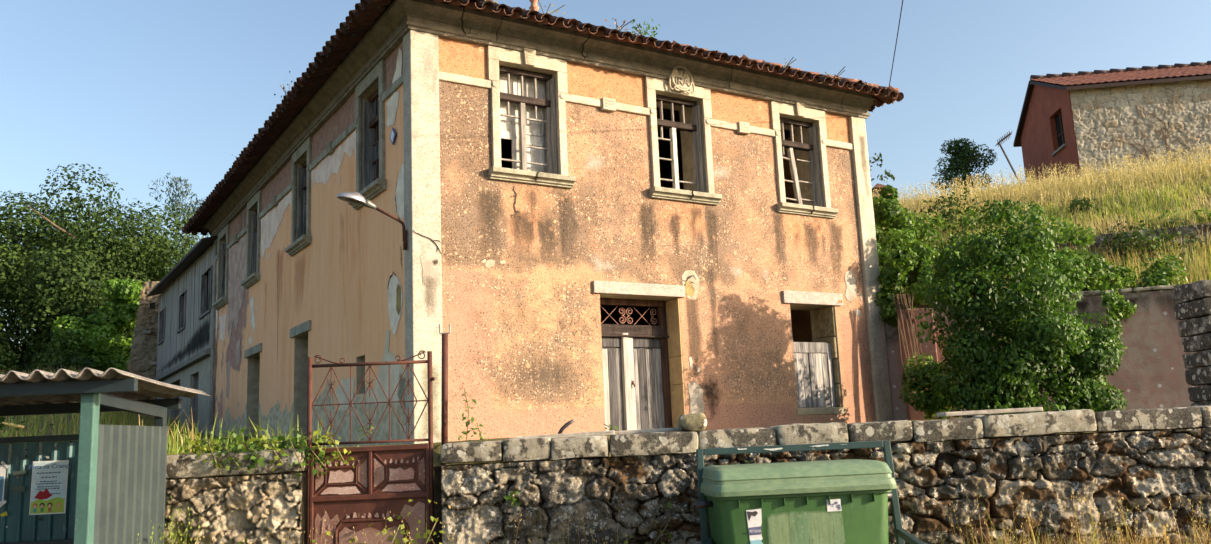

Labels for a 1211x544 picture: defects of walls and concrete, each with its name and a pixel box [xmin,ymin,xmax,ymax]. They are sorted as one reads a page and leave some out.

peeling [311,130,356,186]
water stain [481,193,499,231]
water stain [515,199,575,243]
water stain [641,206,654,243]
water stain [693,211,716,242]
water stain [775,215,817,257]
water stain [831,223,840,254]
water stain [687,300,701,374]
water stain [704,381,719,414]